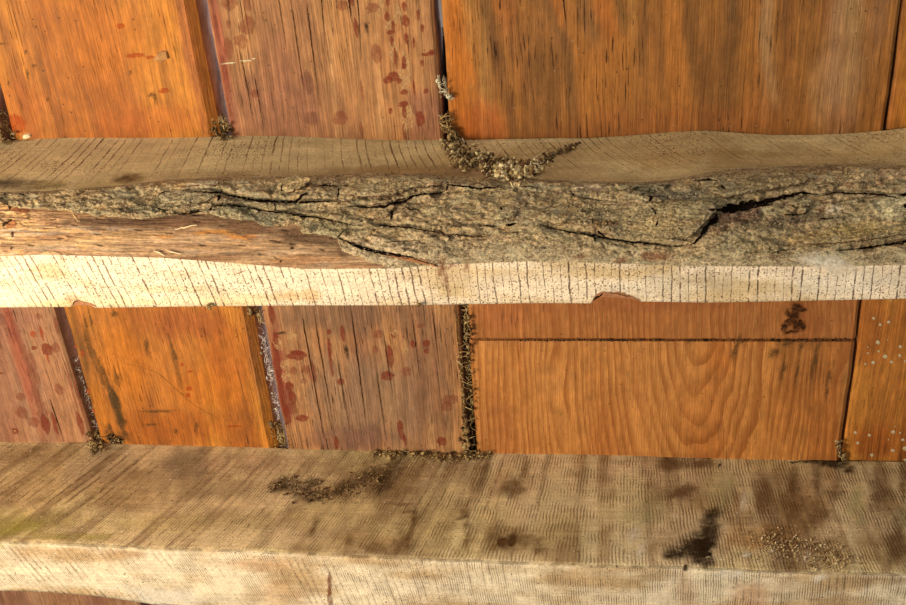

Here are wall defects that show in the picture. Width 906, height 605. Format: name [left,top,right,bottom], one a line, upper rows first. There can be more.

crack [156,182,540,267]
crack [540,178,906,247]
crack [835,240,906,251]
water stain [270,461,401,500]
water stain [664,509,719,571]